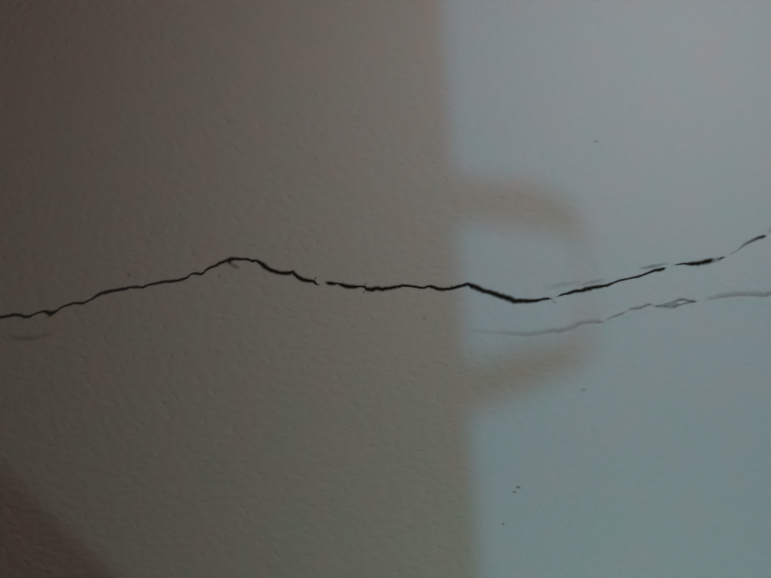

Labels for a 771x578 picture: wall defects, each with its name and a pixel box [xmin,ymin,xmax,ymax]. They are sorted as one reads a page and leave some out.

crack [0,235,765,318]